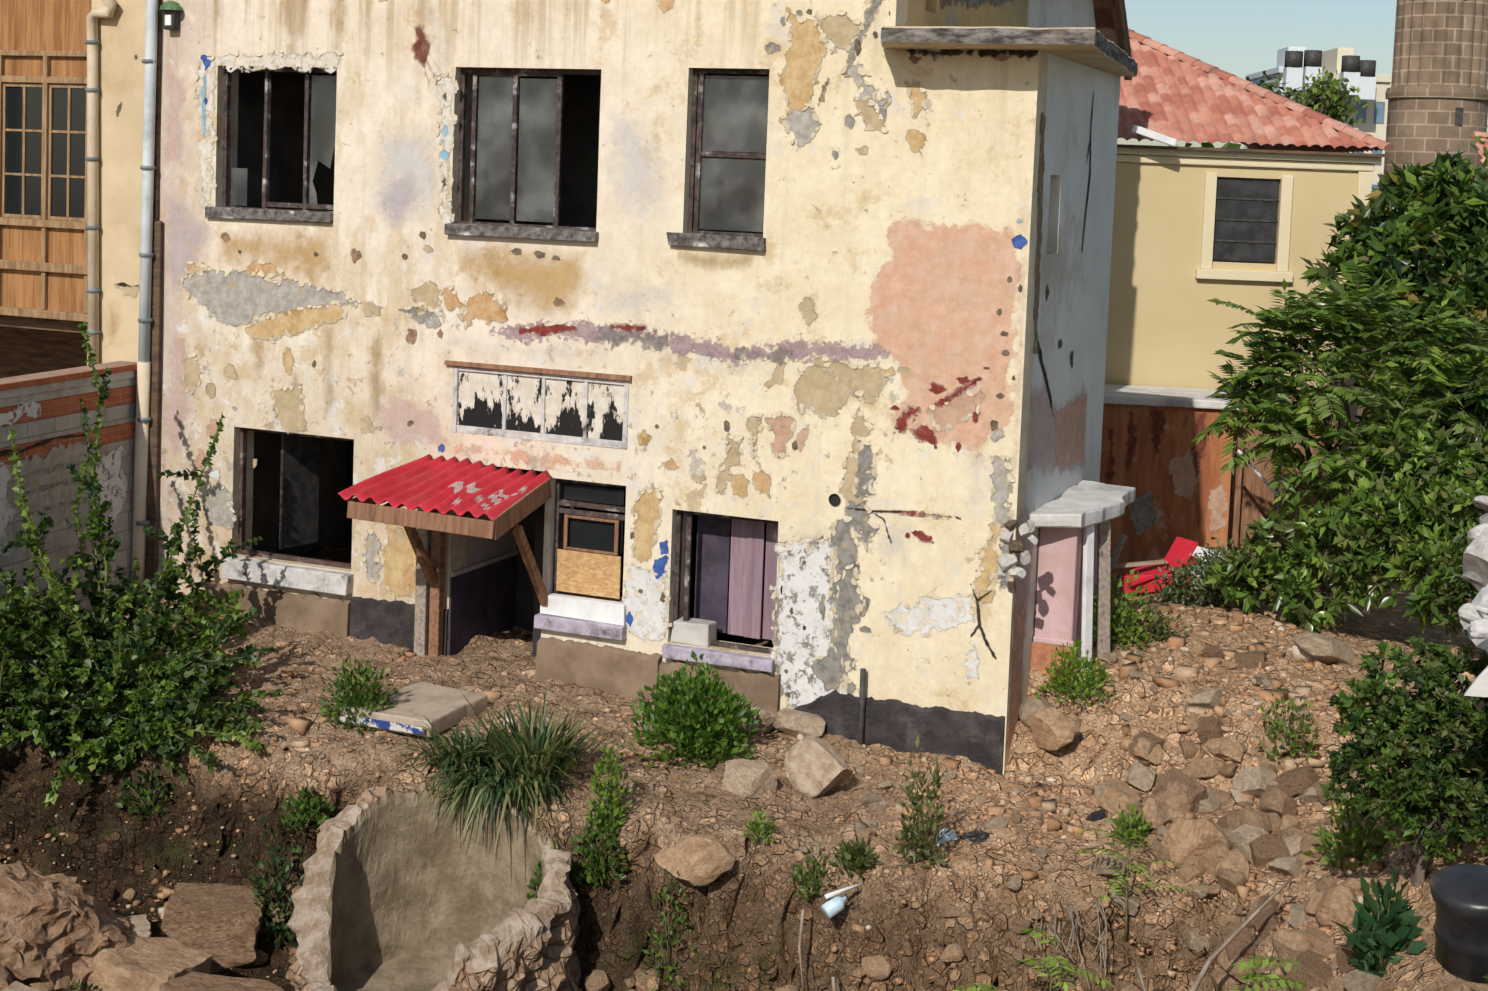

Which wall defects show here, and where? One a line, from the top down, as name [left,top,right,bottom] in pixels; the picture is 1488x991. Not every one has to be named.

peeling [764,0,1038,159]
crack [1082,94,1094,252]
peeling [0,399,42,427]
flaking render [0,438,127,558]
flaking render [179,231,508,434]
peeling [622,356,911,709]
peeling [797,297,818,326]
flaking render [928,389,1038,614]
crack [1038,339,1054,418]
corrosion [1106,409,1166,480]
corrosion [1192,413,1206,477]
crack [970,583,997,659]